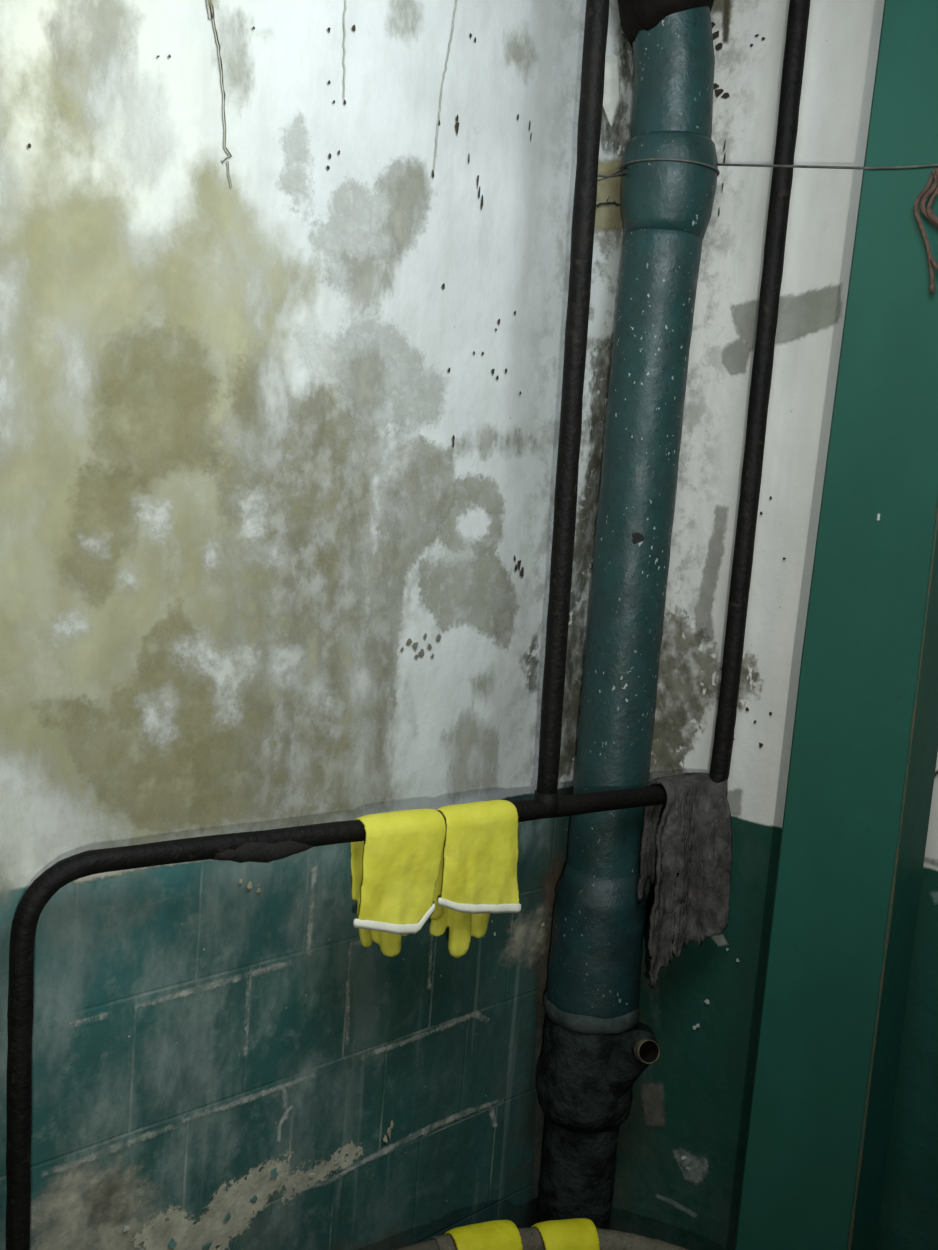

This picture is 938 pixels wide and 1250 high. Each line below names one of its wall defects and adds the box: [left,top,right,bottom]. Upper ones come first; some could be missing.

damp [49,0,171,170]
crack [206,0,232,187]
crack [433,0,457,171]
damp [723,300,759,374]
damp [775,286,841,343]
damp [0,162,521,861]
damp [558,336,613,778]
damp [524,636,539,691]
damp [649,506,727,782]
damp [737,654,761,708]
peeling [373,1012,489,1054]
peeling [30,1063,497,1250]